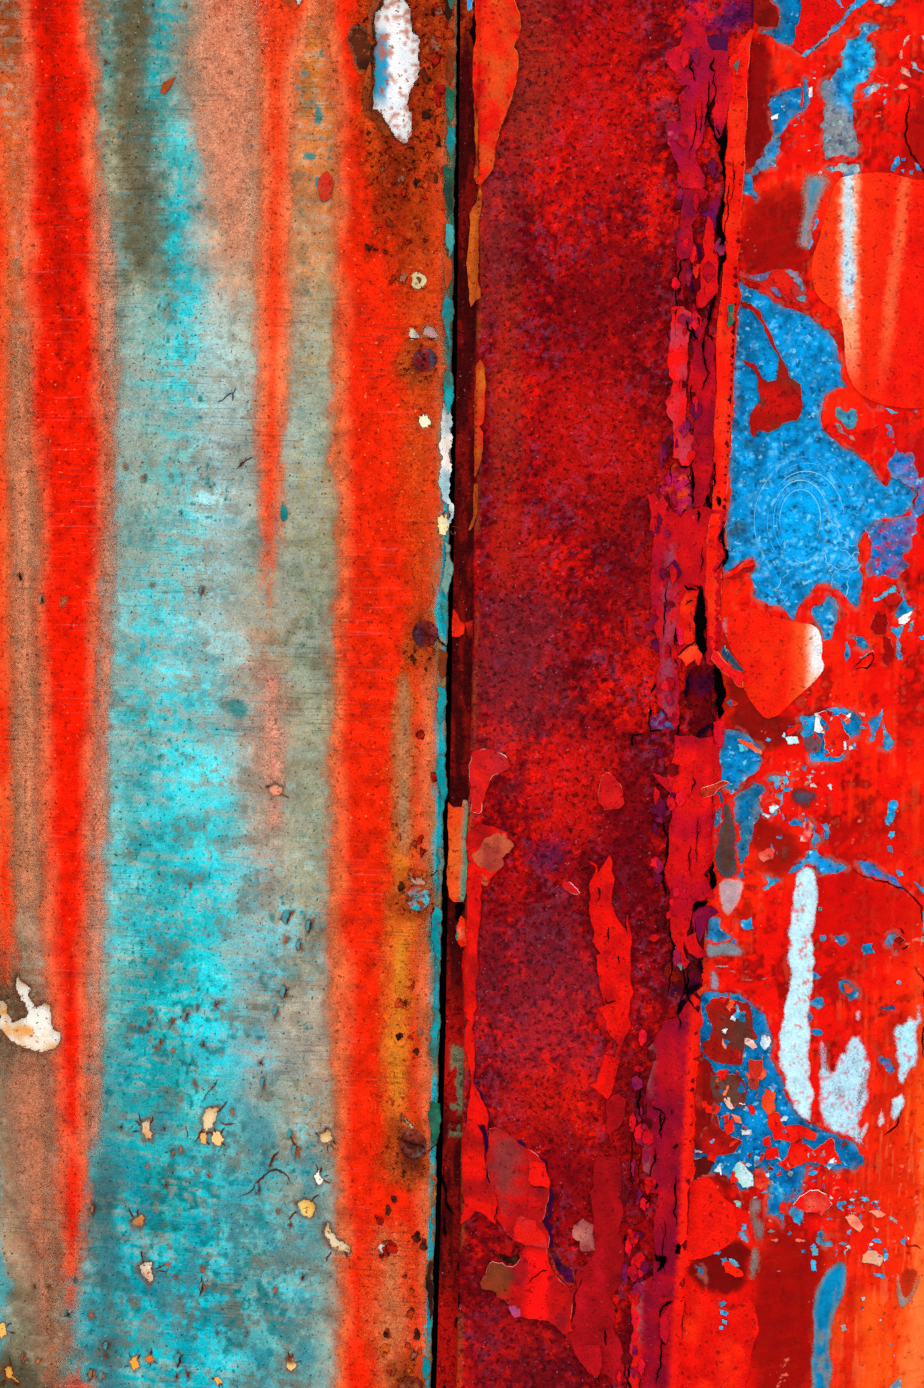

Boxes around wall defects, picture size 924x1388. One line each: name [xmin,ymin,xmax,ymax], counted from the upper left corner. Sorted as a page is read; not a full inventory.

peeling [349,0,521,725]
corrosion [0,0,121,1345]
corrosion [185,0,455,1388]
peeling [431,0,924,1388]
peeling [420,753,448,817]
peeling [0,977,60,1052]
peeling [395,1005,441,1065]
peeling [172,1102,235,1157]
peeling [388,1097,441,1146]
peeling [277,1165,353,1262]
peeling [374,1173,437,1388]
corrosion [55,1369,95,1388]